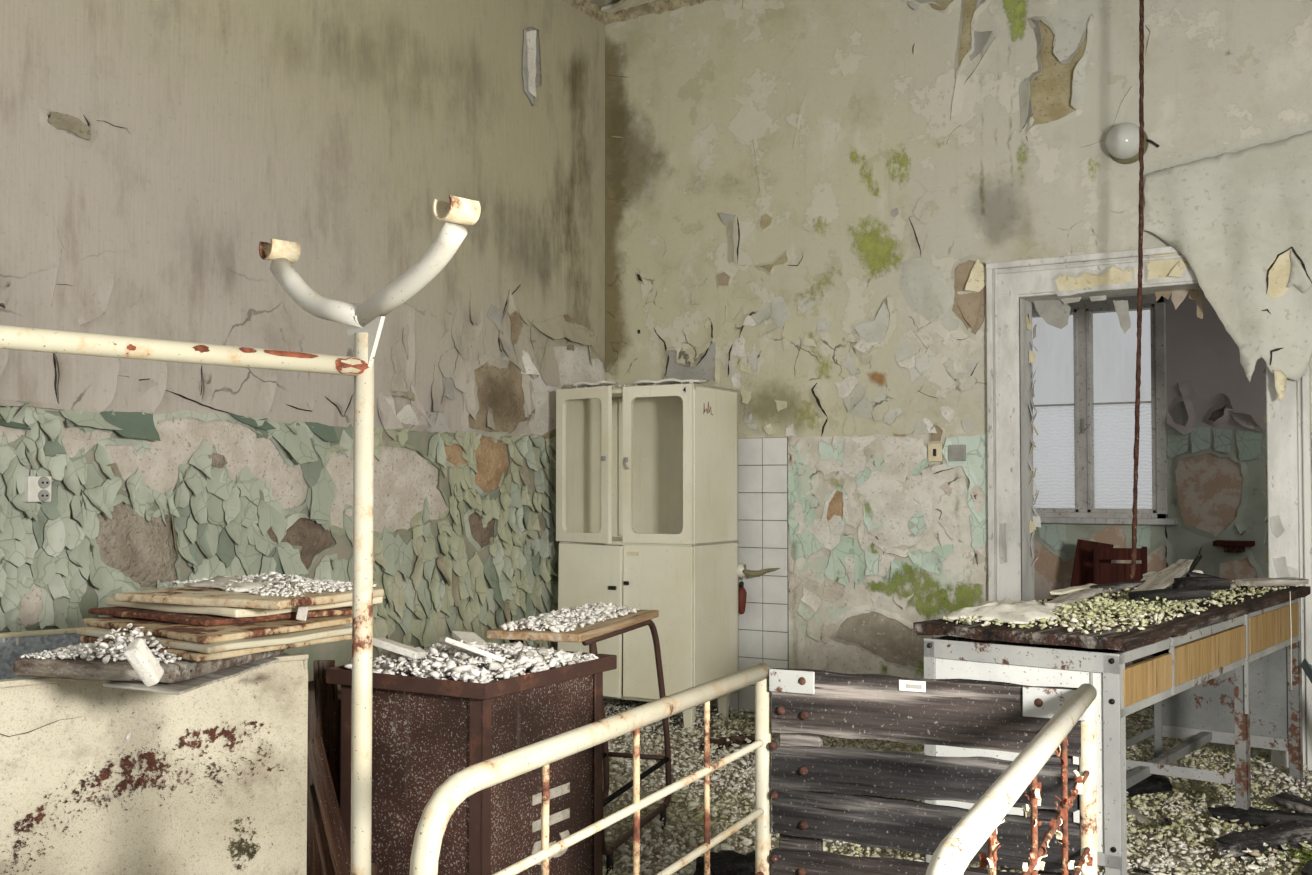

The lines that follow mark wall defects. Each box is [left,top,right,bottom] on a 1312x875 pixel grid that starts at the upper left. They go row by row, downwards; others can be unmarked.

peeling [1019,13,1096,137]
crack [0,253,14,377]
flaking render [0,399,353,632]
crack [53,272,354,421]
crack [401,304,448,435]
peeling [373,283,607,653]
water stain [605,46,649,368]
peeling [661,210,1008,678]
flaking render [1026,314,1174,601]
peeling [1051,130,1312,541]
flaking render [1214,515,1298,586]
corrosion [1,721,284,875]